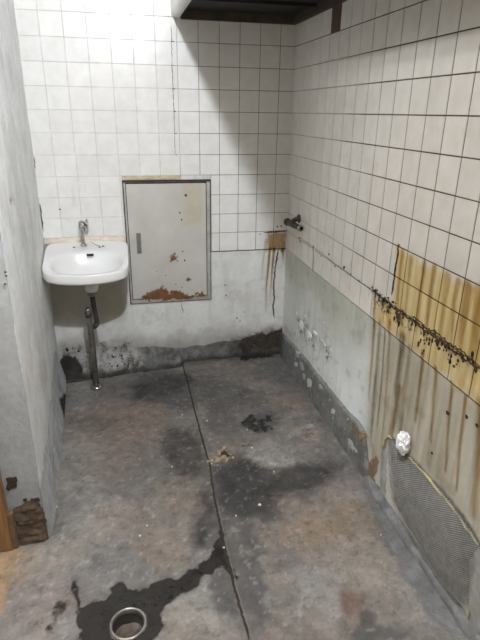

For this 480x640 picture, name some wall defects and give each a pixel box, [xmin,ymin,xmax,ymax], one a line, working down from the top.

rust [260,225,286,266]
rust [140,284,205,302]
crack [271,250,279,318]
crack [299,237,480,374]
leakage [60,346,90,380]
leakage [230,329,282,361]
peeling [293,312,332,389]
spalling [6,476,17,491]
spalling [13,497,49,546]
crack [66,365,253,640]
rust [368,456,380,489]
leakage [71,531,238,640]